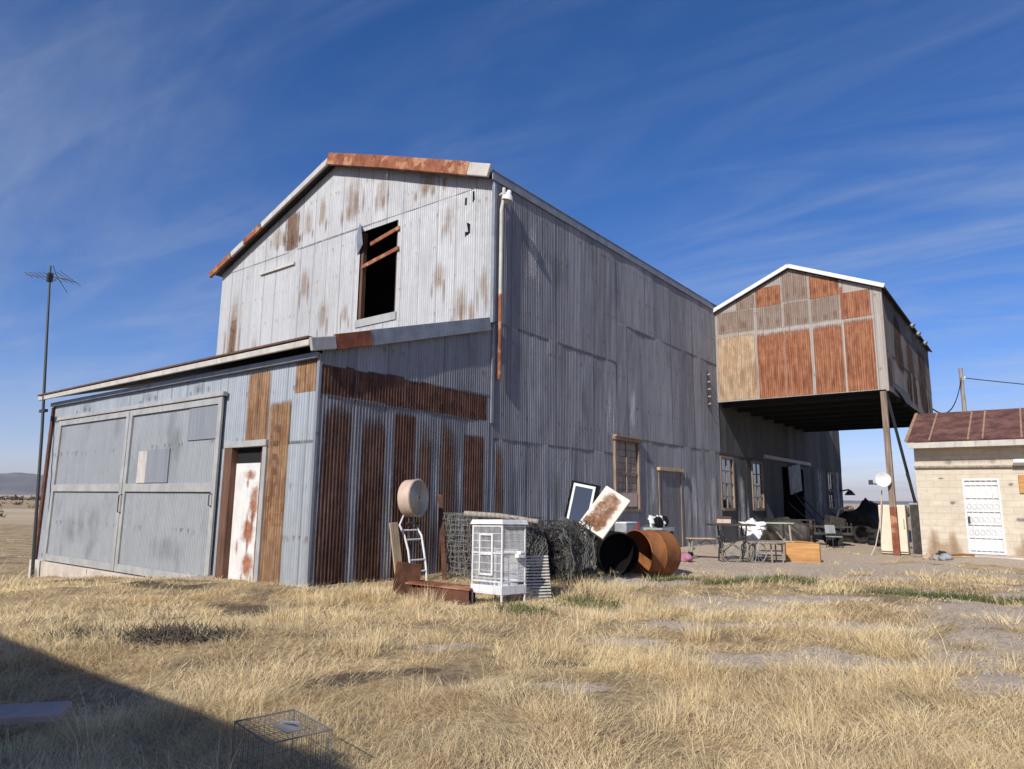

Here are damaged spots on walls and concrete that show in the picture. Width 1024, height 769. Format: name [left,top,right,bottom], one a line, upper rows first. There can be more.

rust [283,212,313,251]
rust [718,272,930,411]
rust [236,359,503,587]